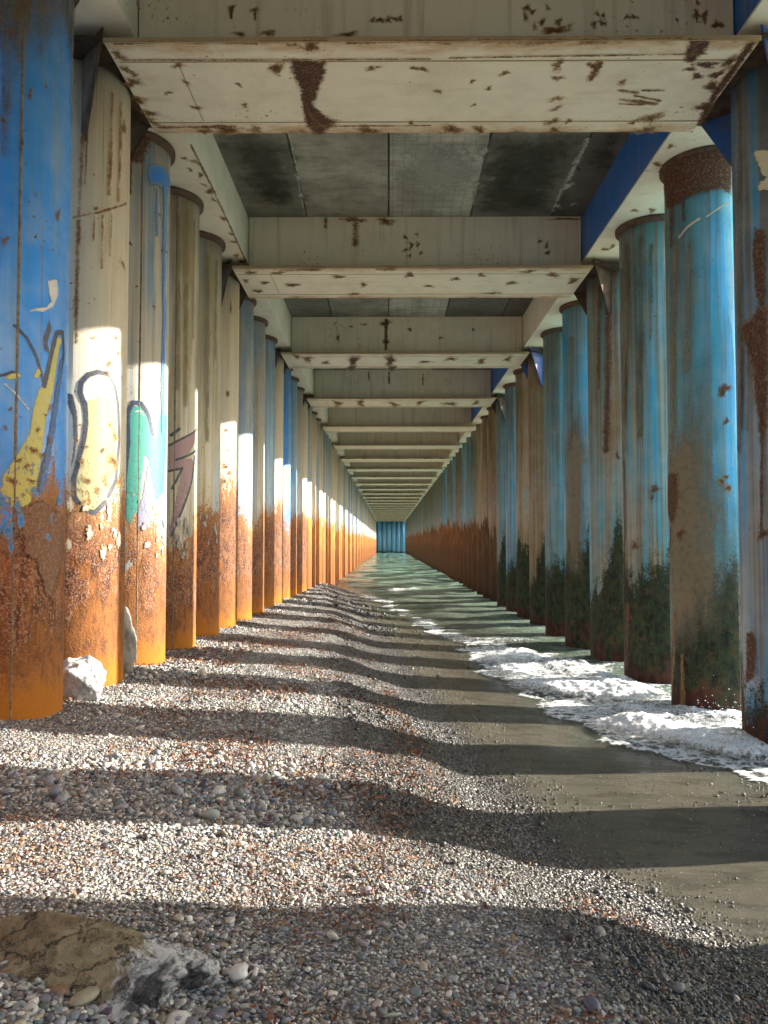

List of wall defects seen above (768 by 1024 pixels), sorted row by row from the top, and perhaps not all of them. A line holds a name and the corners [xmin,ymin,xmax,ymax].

corrosion [73,4,645,344]
damp [473,138,590,213]
corrosion [632,127,741,248]
corrosion [623,36,755,125]
corrosion [0,445,308,721]
corrosion [597,282,638,669]
corrosion [601,236,653,419]
corrosion [719,227,768,541]